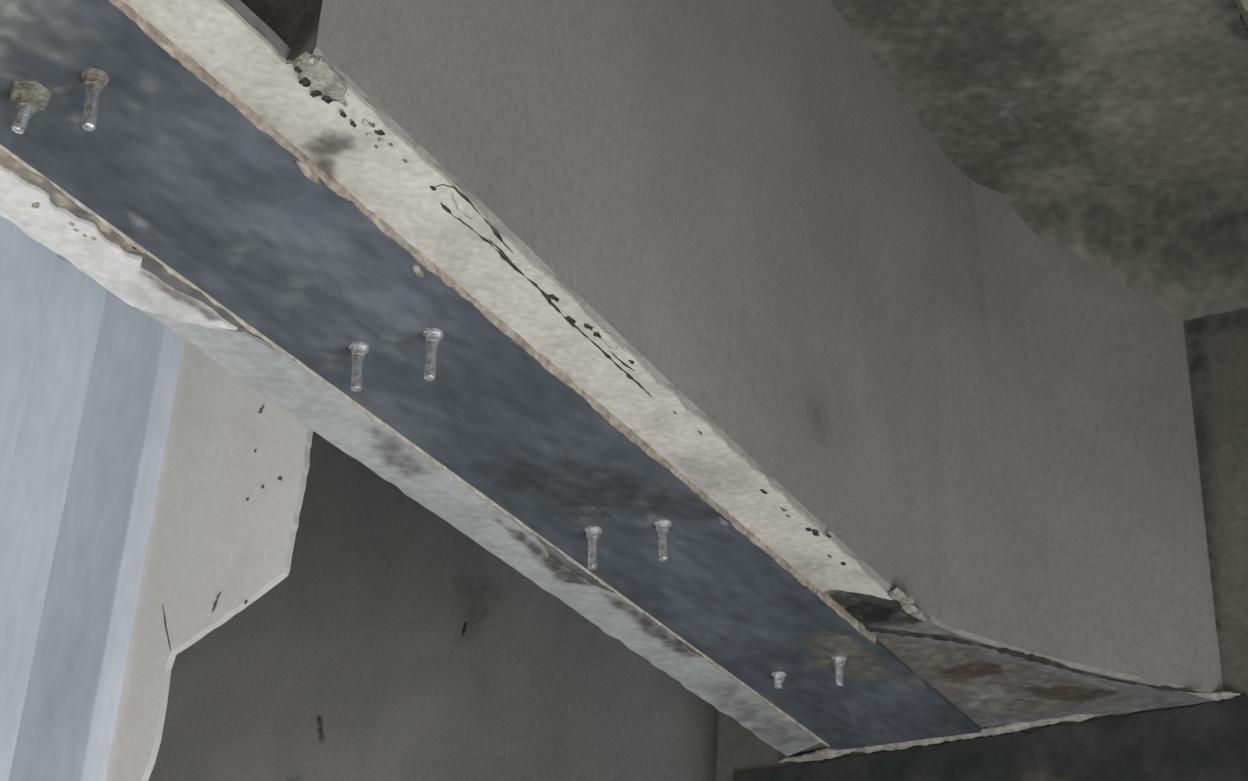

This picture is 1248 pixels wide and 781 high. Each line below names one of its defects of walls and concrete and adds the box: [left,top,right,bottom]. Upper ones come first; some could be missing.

crack [430,184,652,397]